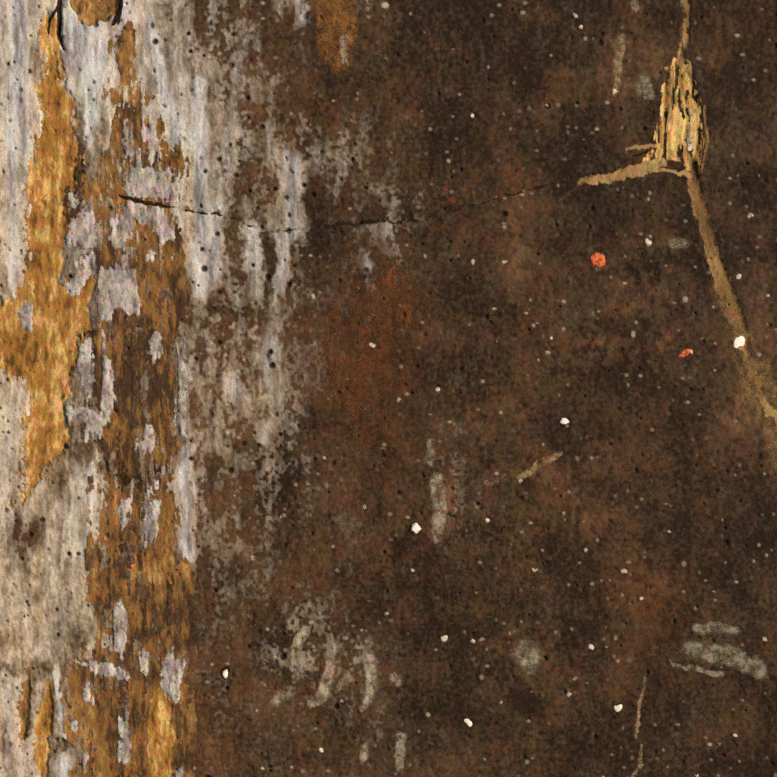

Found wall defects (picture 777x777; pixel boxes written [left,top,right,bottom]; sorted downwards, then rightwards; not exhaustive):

crack [47,0,65,50]
corrosion [315,0,356,70]
crack [119,194,252,227]
crack [271,217,428,233]
crack [452,0,777,460]
peeling [0,0,199,777]